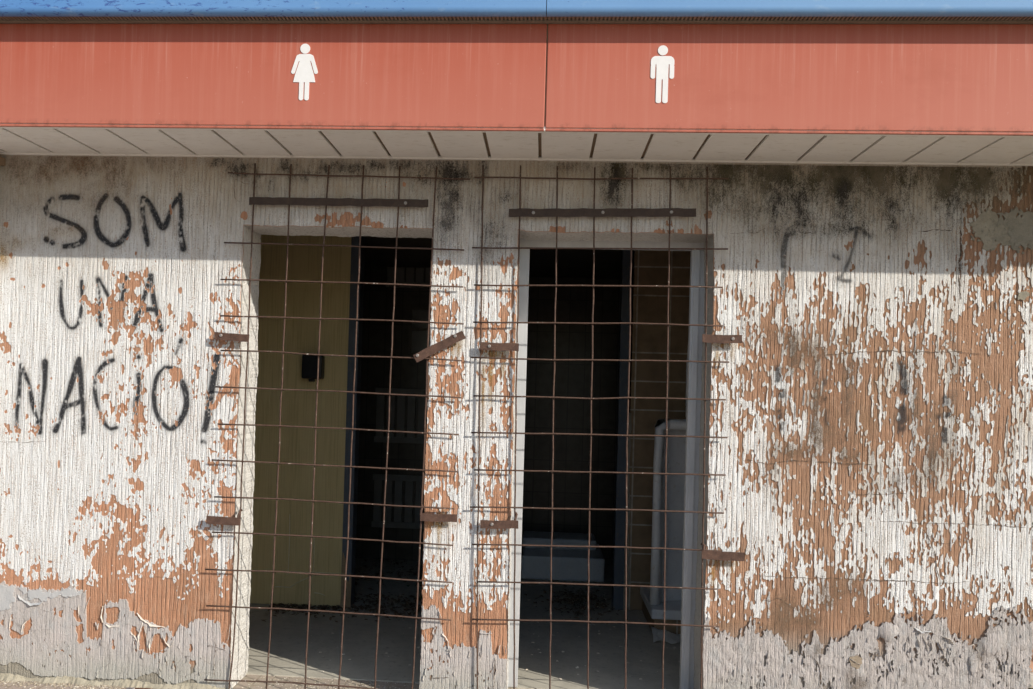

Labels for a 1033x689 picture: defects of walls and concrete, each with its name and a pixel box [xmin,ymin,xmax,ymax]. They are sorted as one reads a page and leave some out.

peeling [0,258,242,685]
peeling [314,211,384,228]
water stain [279,159,487,230]
peeling [422,243,518,689]
water stain [601,163,1027,235]
peeling [703,166,1033,689]